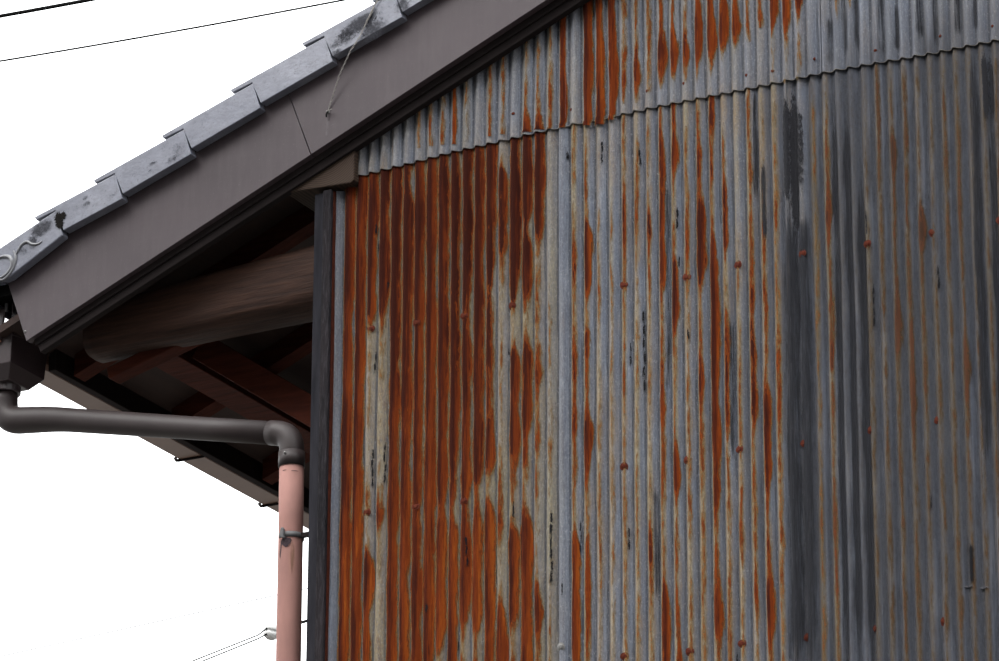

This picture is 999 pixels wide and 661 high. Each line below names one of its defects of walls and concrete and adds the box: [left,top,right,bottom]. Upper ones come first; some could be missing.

corrosion [337,0,803,661]
corrosion [811,93,841,661]
corrosion [865,59,999,661]